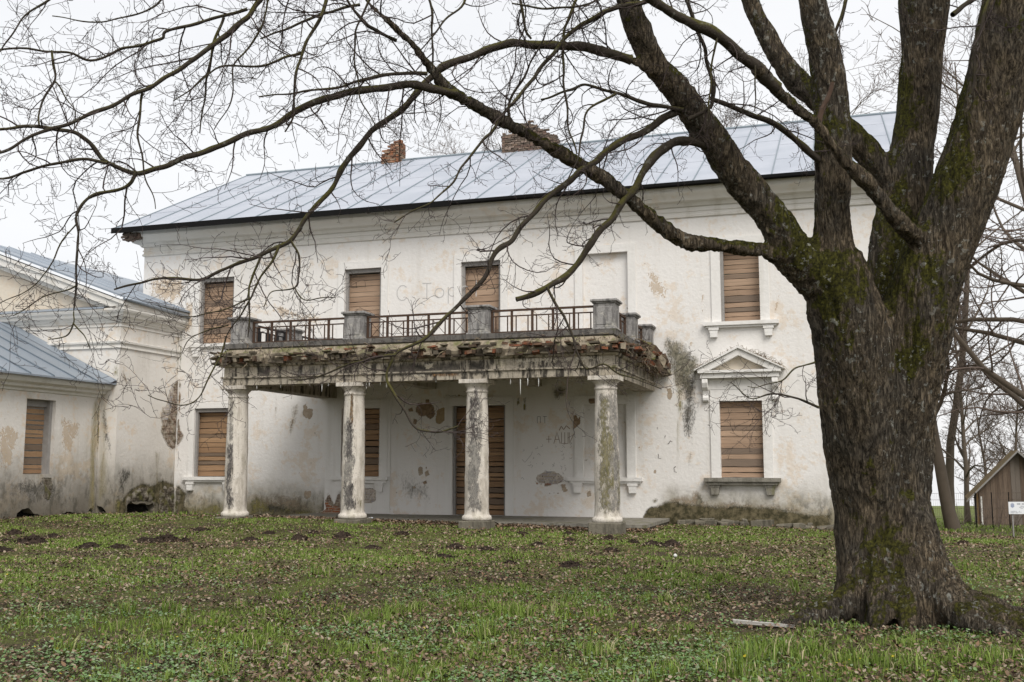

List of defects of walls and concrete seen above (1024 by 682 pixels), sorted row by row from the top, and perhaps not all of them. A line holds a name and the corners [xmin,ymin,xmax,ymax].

spalling [127,486,189,514]
spalling [160,380,184,452]
spalling [317,492,341,513]
water stain [343,393,363,509]
flaking render [408,399,445,424]
water stain [467,389,483,512]
spalling [535,471,568,494]
water stain [595,391,620,513]
water stain [665,341,697,437]